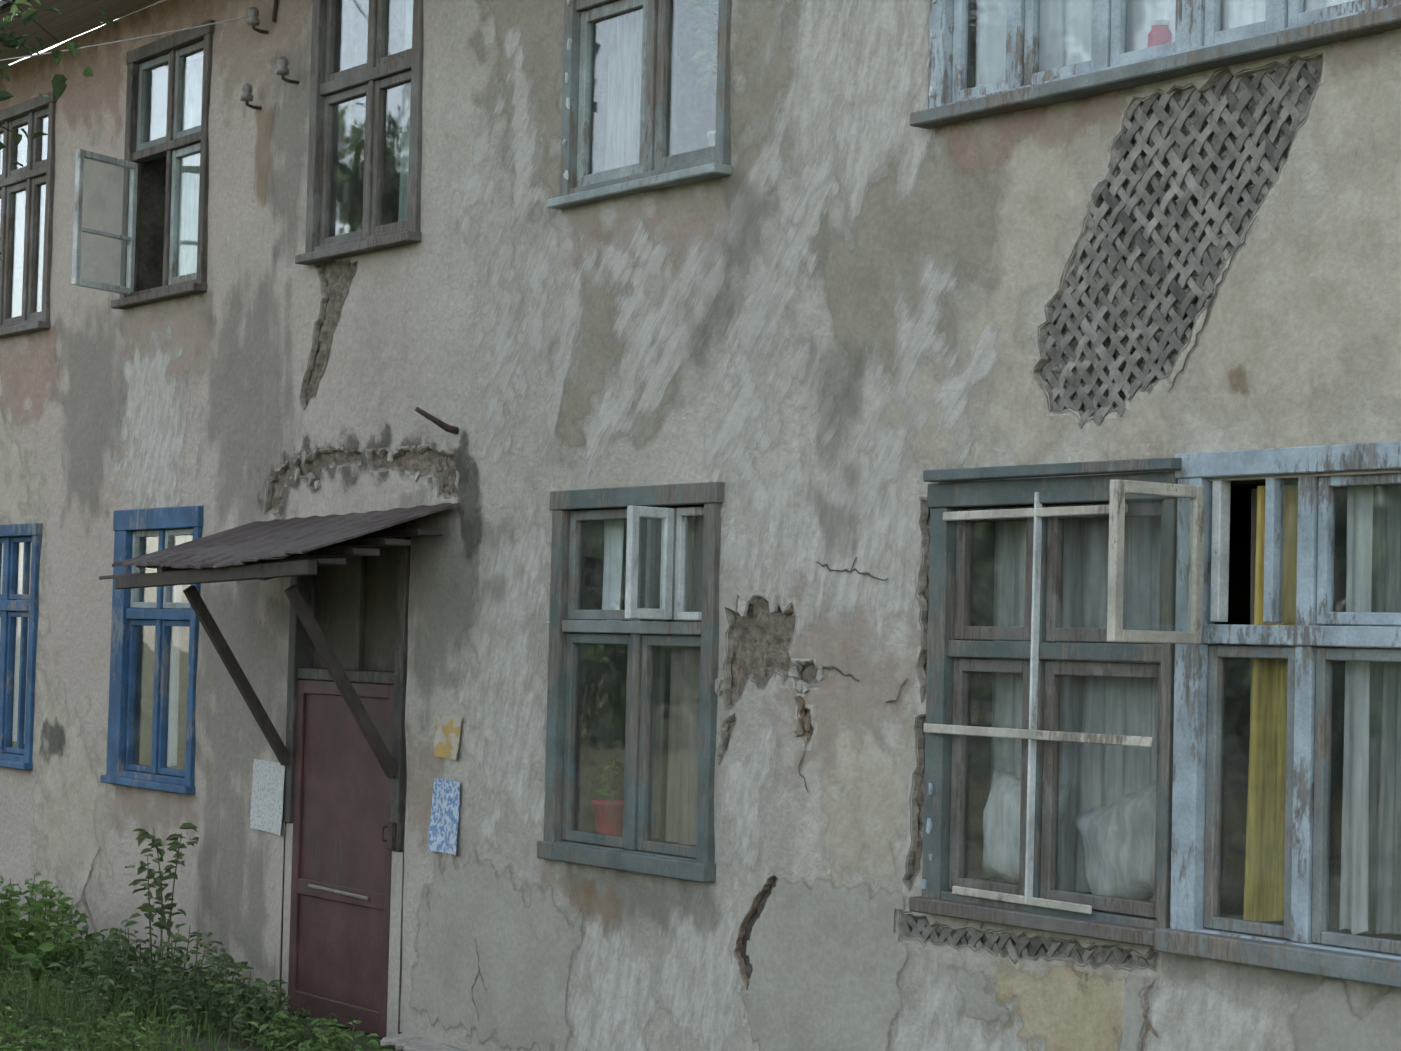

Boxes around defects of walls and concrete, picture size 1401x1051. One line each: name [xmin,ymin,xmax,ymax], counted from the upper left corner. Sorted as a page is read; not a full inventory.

spalling [299,259,358,411]
damp [258,27,999,558]
spalling [1031,52,1323,429]
spalling [264,445,460,515]
crack [817,557,888,581]
spalling [715,594,825,765]
spalling [902,497,933,892]
spalling [898,909,1159,972]